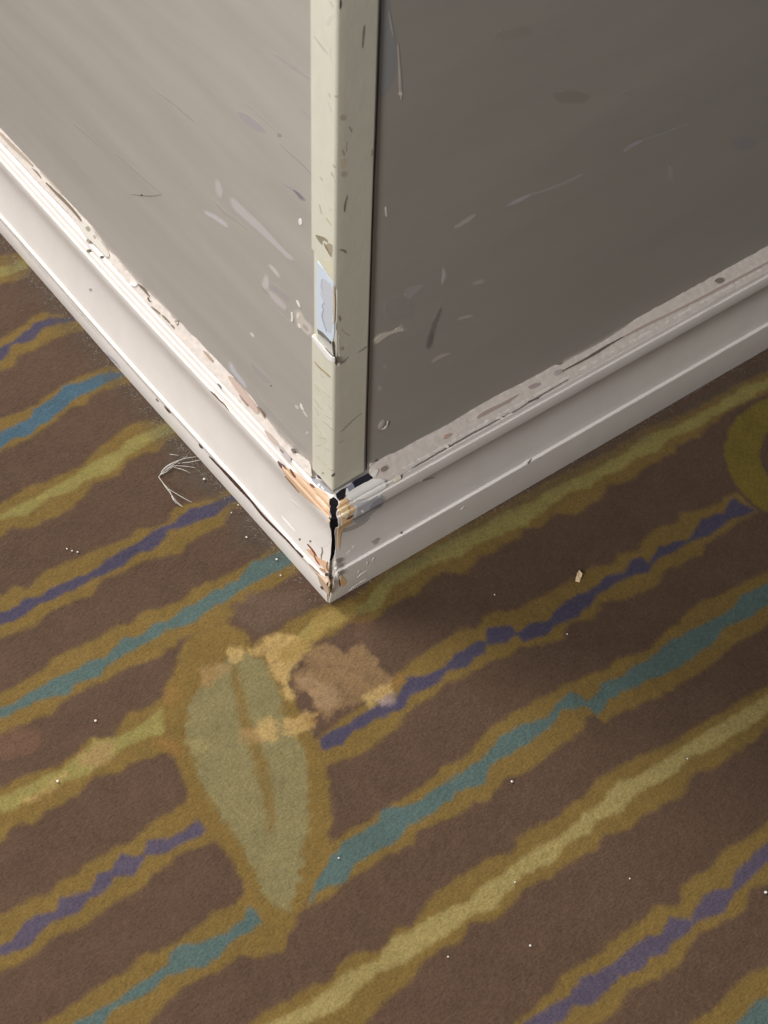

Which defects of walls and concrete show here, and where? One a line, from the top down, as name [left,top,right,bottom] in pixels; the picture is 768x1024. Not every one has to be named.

peeling [79,223,110,257]
crack [199,444,338,596]
peeling [311,463,387,522]